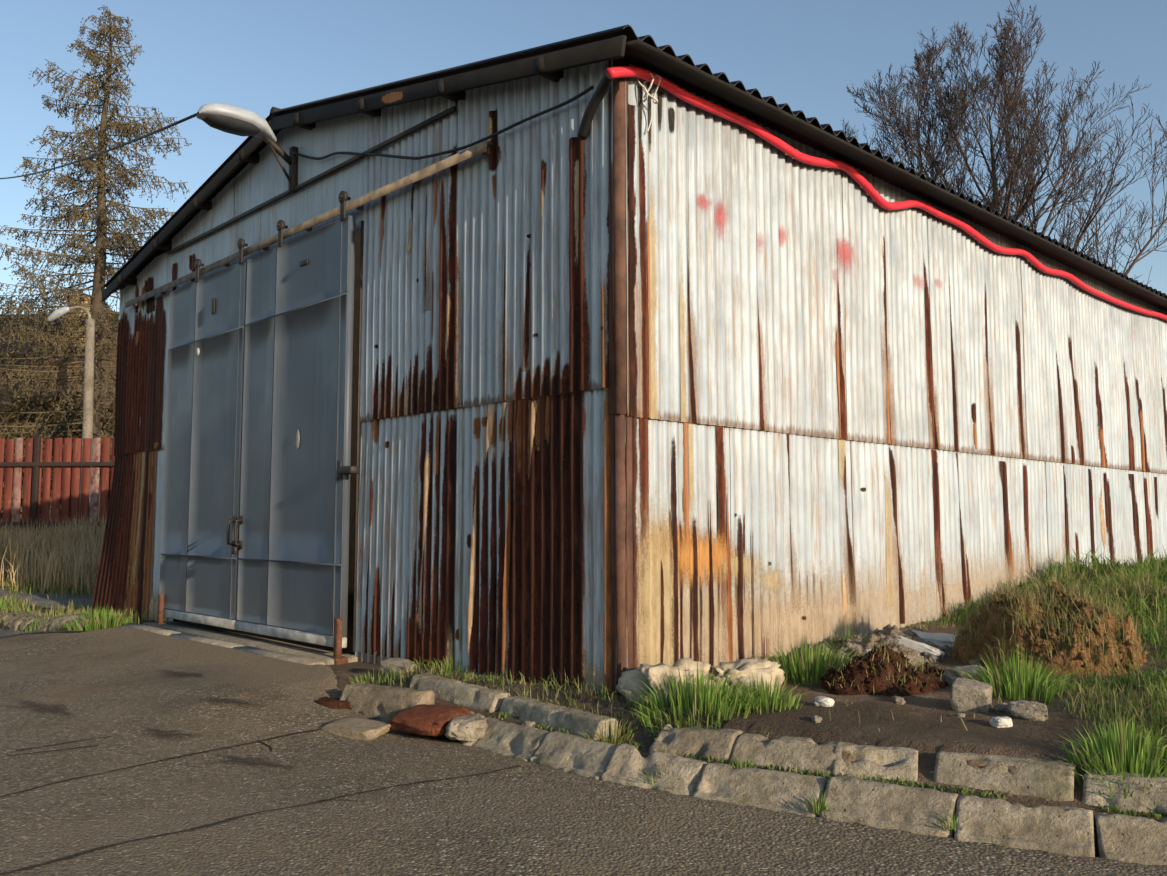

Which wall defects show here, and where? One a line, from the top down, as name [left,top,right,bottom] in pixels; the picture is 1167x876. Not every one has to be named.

corrosion [91,254,196,621]
corrosion [364,103,823,695]
corrosion [836,281,857,635]
corrosion [883,237,905,624]
corrosion [924,263,946,617]
corrosion [949,280,959,484]
corrosion [959,501,972,604]
corrosion [971,286,1014,588]
corrosion [1016,320,1030,570]
corrosion [1056,338,1115,566]